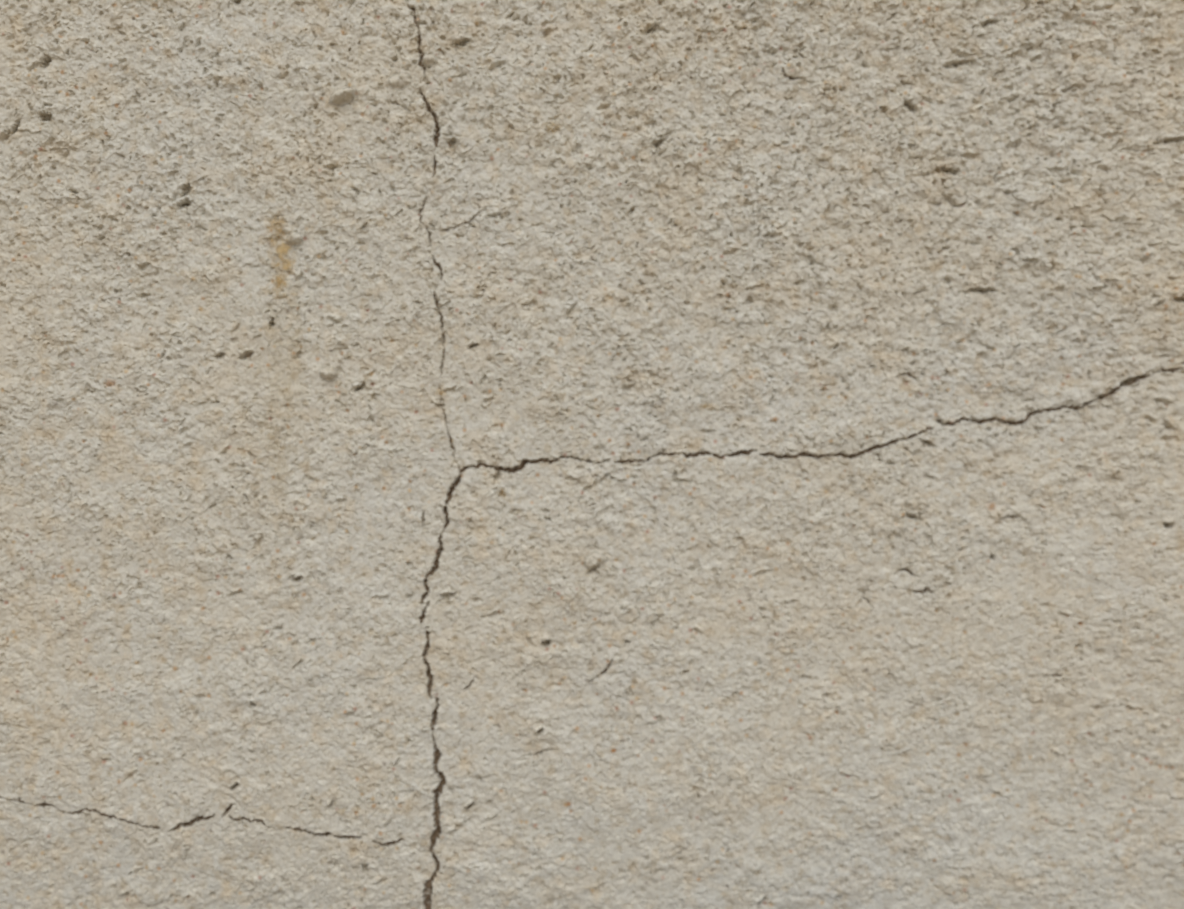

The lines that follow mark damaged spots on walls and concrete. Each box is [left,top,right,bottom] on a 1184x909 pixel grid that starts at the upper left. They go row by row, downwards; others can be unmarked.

crack [397,7,440,175]
crack [419,204,474,369]
crack [419,362,1184,909]
crack [0,796,403,846]